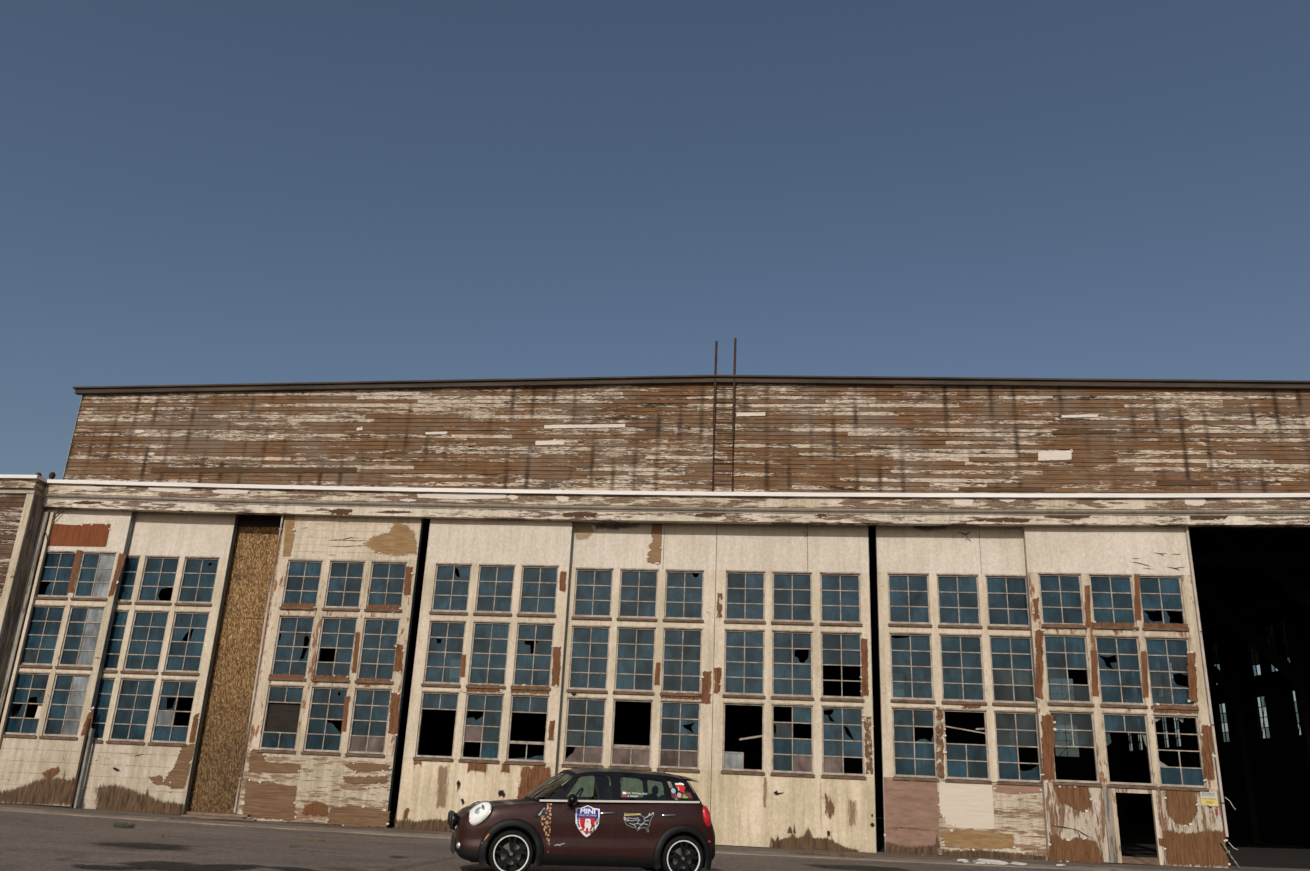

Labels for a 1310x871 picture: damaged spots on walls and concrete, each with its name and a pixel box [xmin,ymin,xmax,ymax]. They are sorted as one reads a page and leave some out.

peeling [953,498,1092,523]
peeling [1185,502,1228,521]
peeling [363,499,418,614]
peeling [242,748,301,822]
peeling [342,762,392,785]
peeling [498,765,551,799]
peeling [326,805,391,828]
peeling [938,803,1016,851]
peeling [1047,833,1103,863]